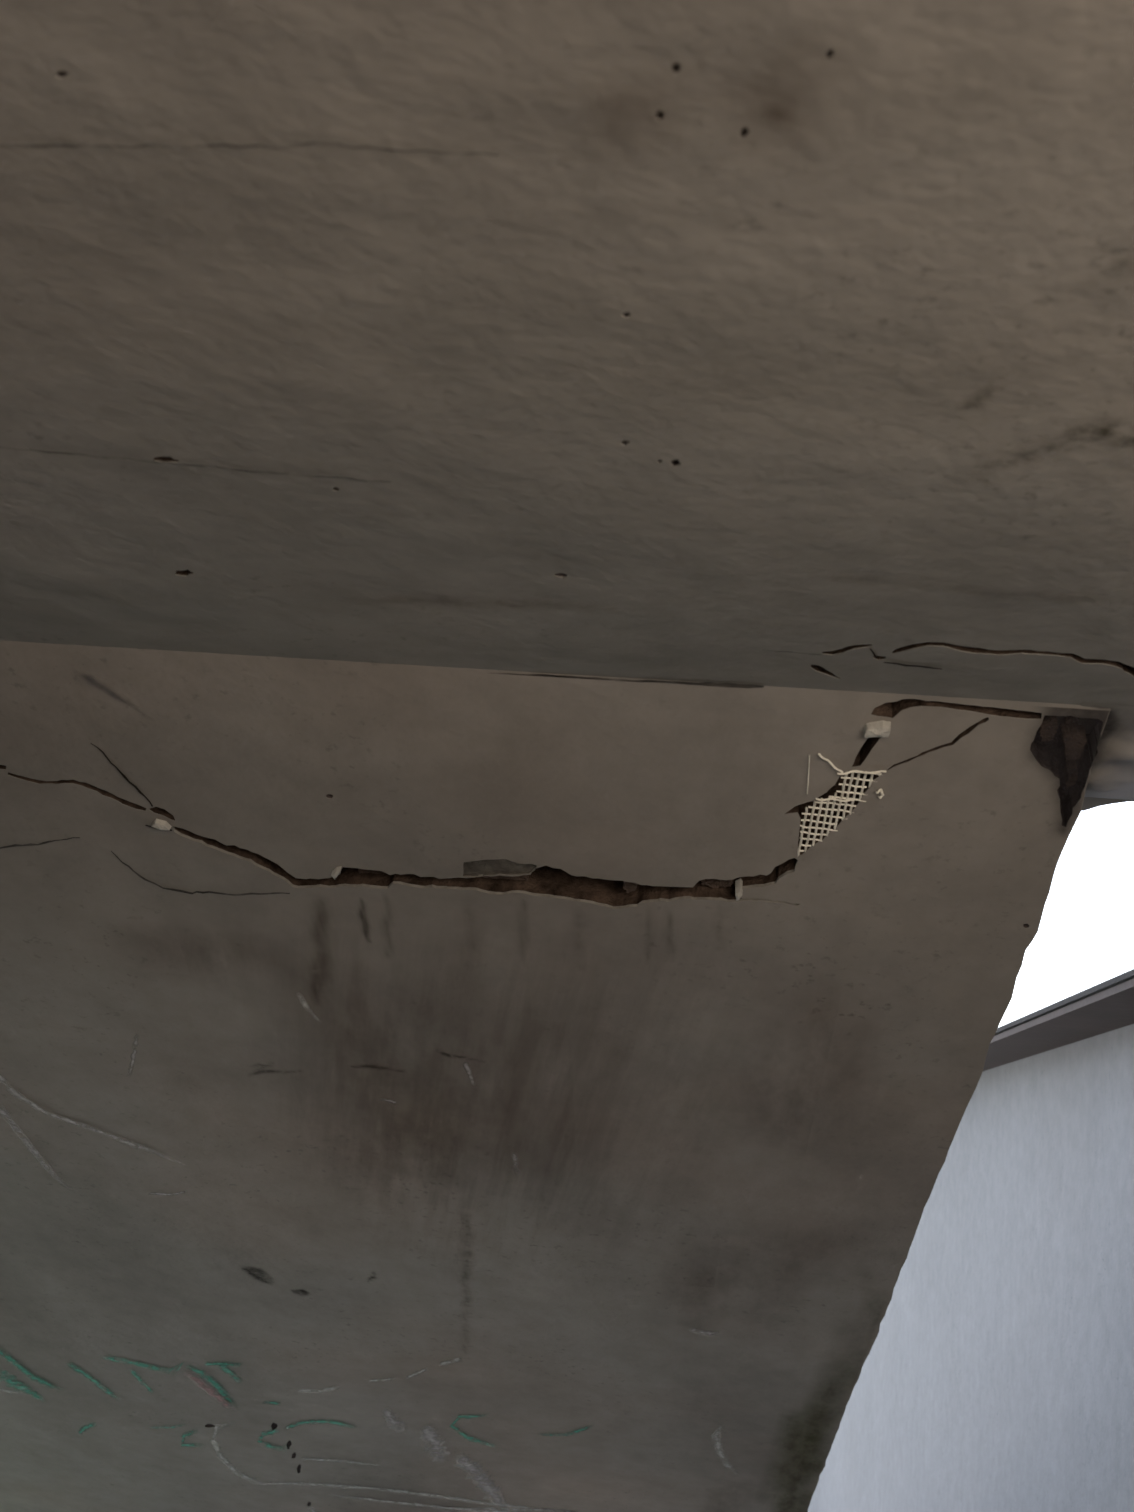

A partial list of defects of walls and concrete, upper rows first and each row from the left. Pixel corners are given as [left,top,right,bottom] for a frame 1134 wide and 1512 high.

crack [0,642,1134,909]